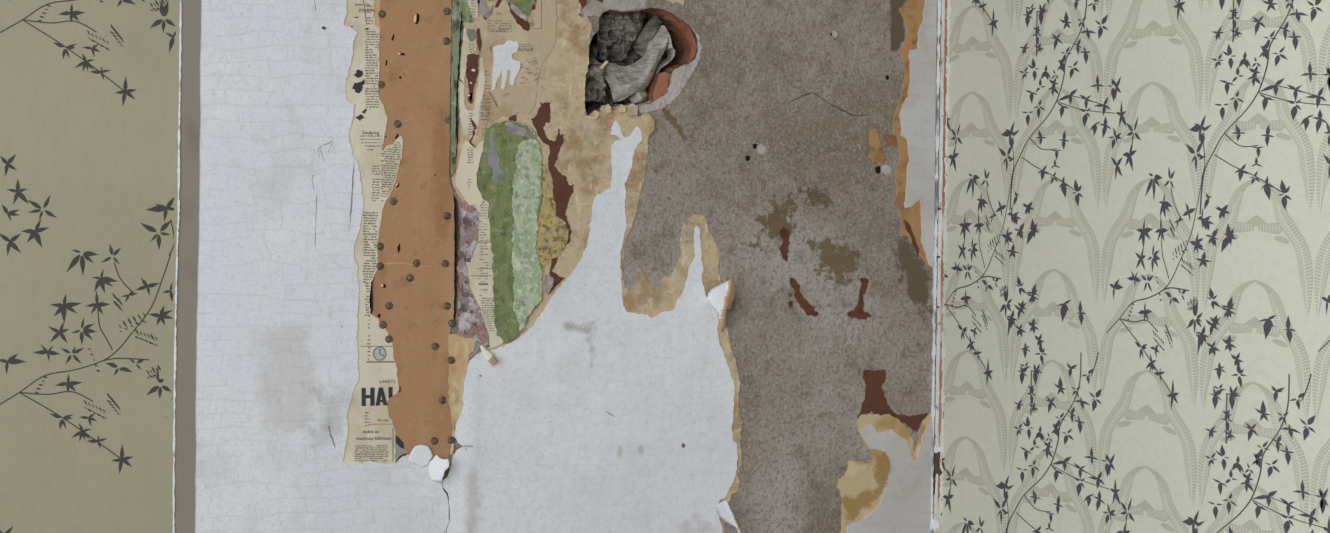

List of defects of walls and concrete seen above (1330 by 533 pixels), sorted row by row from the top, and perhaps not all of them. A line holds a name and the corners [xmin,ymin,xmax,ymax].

peeling [462,0,536,51]
spalling [580,0,702,115]
peeling [457,115,569,360]
crack [441,443,473,533]
spalling [933,446,942,495]